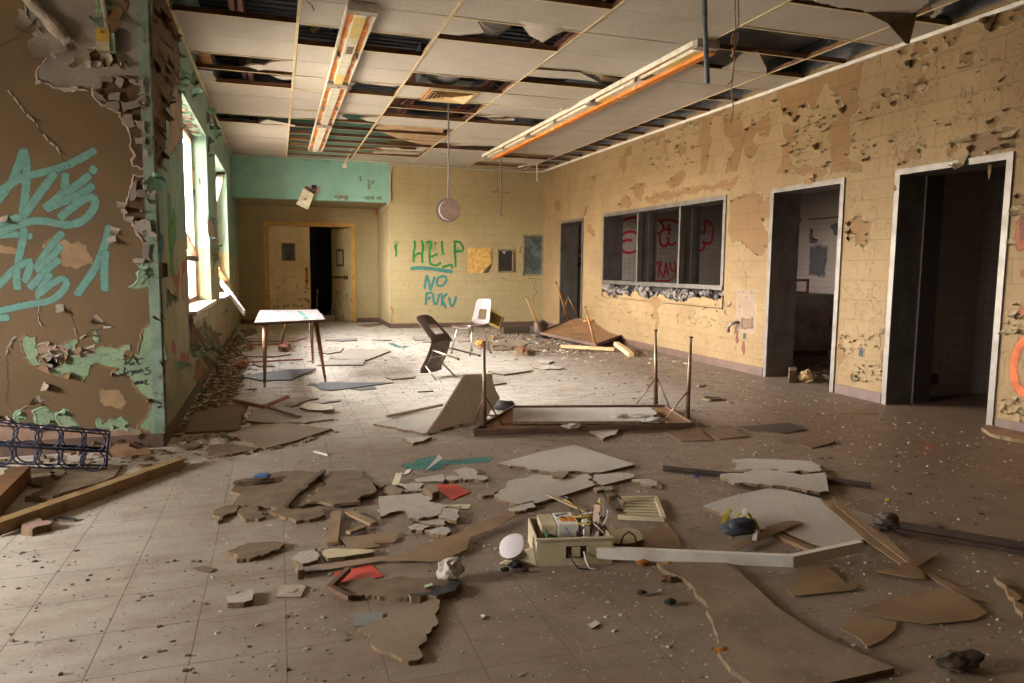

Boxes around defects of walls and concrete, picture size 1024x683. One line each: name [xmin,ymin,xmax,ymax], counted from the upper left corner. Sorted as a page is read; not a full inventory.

peeling [978,5,1024,33]
peeling [14,0,223,289]
peeling [618,27,994,257]
peeling [934,90,1020,169]
peeling [1007,193,1024,216]
spalling [590,284,730,337]
peeling [997,302,1022,336]
peeling [0,288,256,446]
peeling [836,328,885,382]